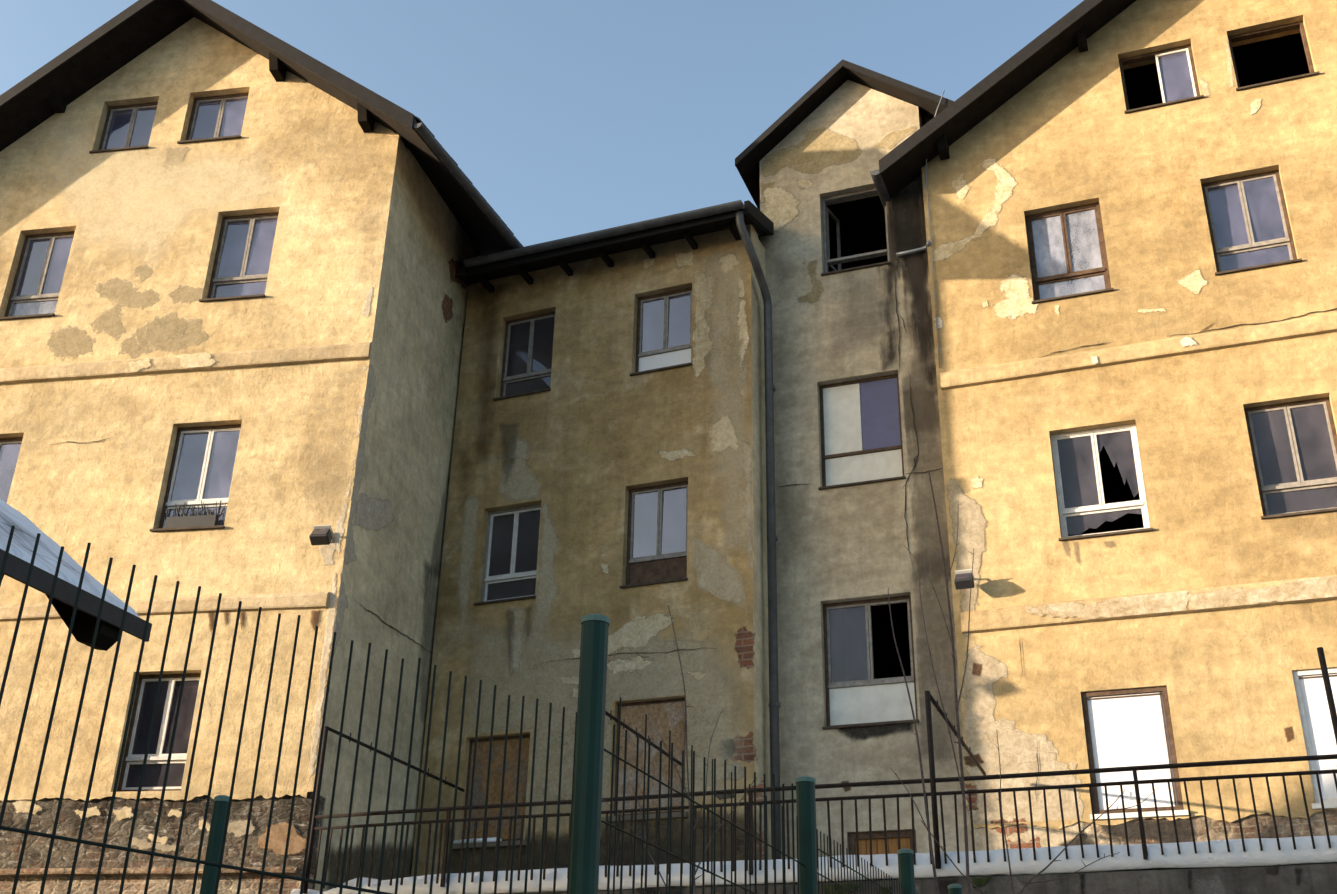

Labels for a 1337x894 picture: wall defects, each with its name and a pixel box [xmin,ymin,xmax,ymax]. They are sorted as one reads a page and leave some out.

flaking render [59,141,265,249]
peeling [760,126,916,232]
flaking render [932,158,1017,262]
flaking render [46,264,216,372]
water stain [883,254,934,368]
flaking render [982,274,1039,319]
crack [1169,308,1337,336]
flaking render [476,438,581,802]
spalling [947,476,987,612]
spalling [1024,576,1337,620]
flaking render [602,613,764,807]
spalling [963,633,1337,851]